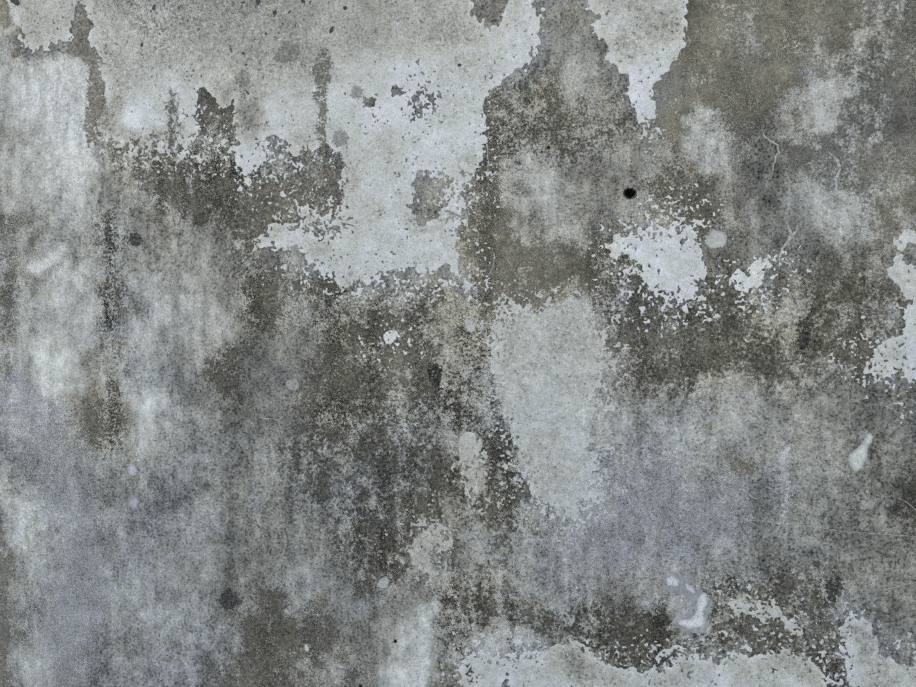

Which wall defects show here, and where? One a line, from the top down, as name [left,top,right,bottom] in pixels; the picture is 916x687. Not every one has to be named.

leakage [65,8,106,149]
leakage [274,41,300,63]
leakage [639,0,916,248]
peeling [6,0,814,495]
leakage [107,48,853,687]
peeling [826,229,916,424]
leakage [887,468,916,543]
peeling [440,579,916,687]